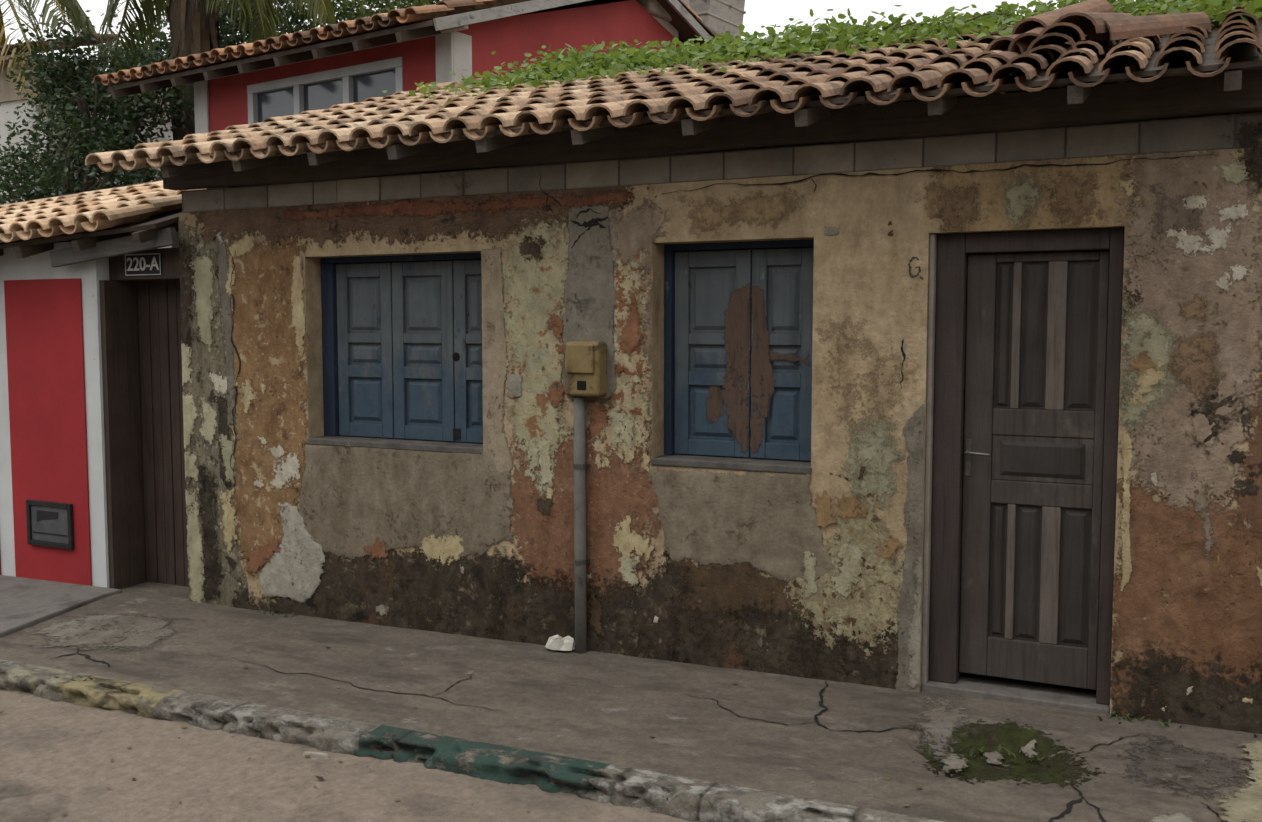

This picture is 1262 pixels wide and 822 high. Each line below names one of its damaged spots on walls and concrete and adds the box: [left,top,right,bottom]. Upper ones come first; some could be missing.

peeling [190,183,661,602]
water stain [178,217,922,689]
crack [538,167,608,248]
peeling [705,283,915,661]
flaking render [1113,149,1262,540]
water stain [1188,382,1245,455]
water stain [1110,645,1262,734]